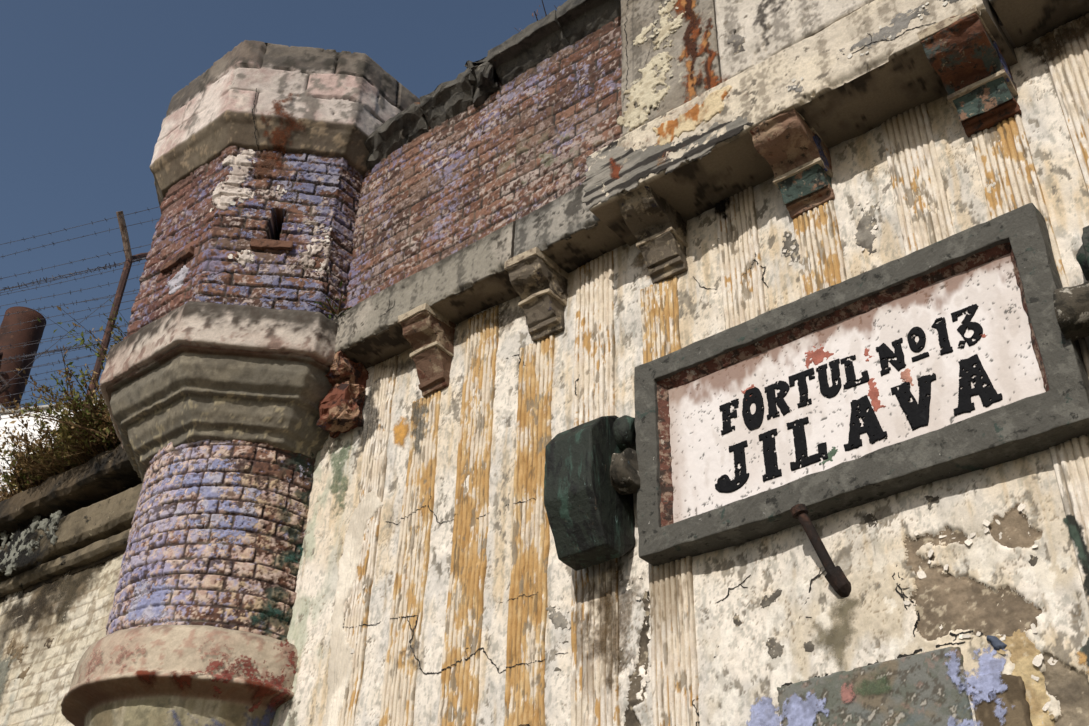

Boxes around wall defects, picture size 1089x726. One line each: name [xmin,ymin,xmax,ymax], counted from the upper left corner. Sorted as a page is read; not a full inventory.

rust [674,0,727,103]
rust [254,93,304,180]
flaking render [581,0,754,211]
peeling [165,149,355,312]
crack [386,491,536,525]
flaking render [925,495,939,510]
rust [136,670,194,690]
rust [244,678,279,700]
crack [343,598,568,675]
flaking render [766,637,784,659]
peeling [746,692,829,726]
flaking render [903,503,1089,726]